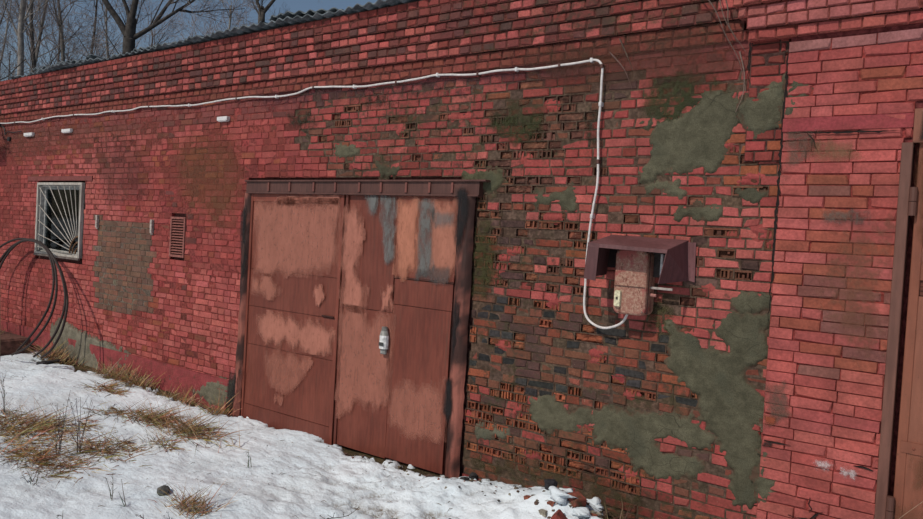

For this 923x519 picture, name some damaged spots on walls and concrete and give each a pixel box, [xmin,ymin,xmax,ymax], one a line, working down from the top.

spalling [724,143,768,195]
spalling [440,95,598,328]
spalling [704,224,774,258]
spalling [681,269,753,307]
spalling [490,333,526,354]
spalling [576,324,608,364]
spalling [611,374,657,401]